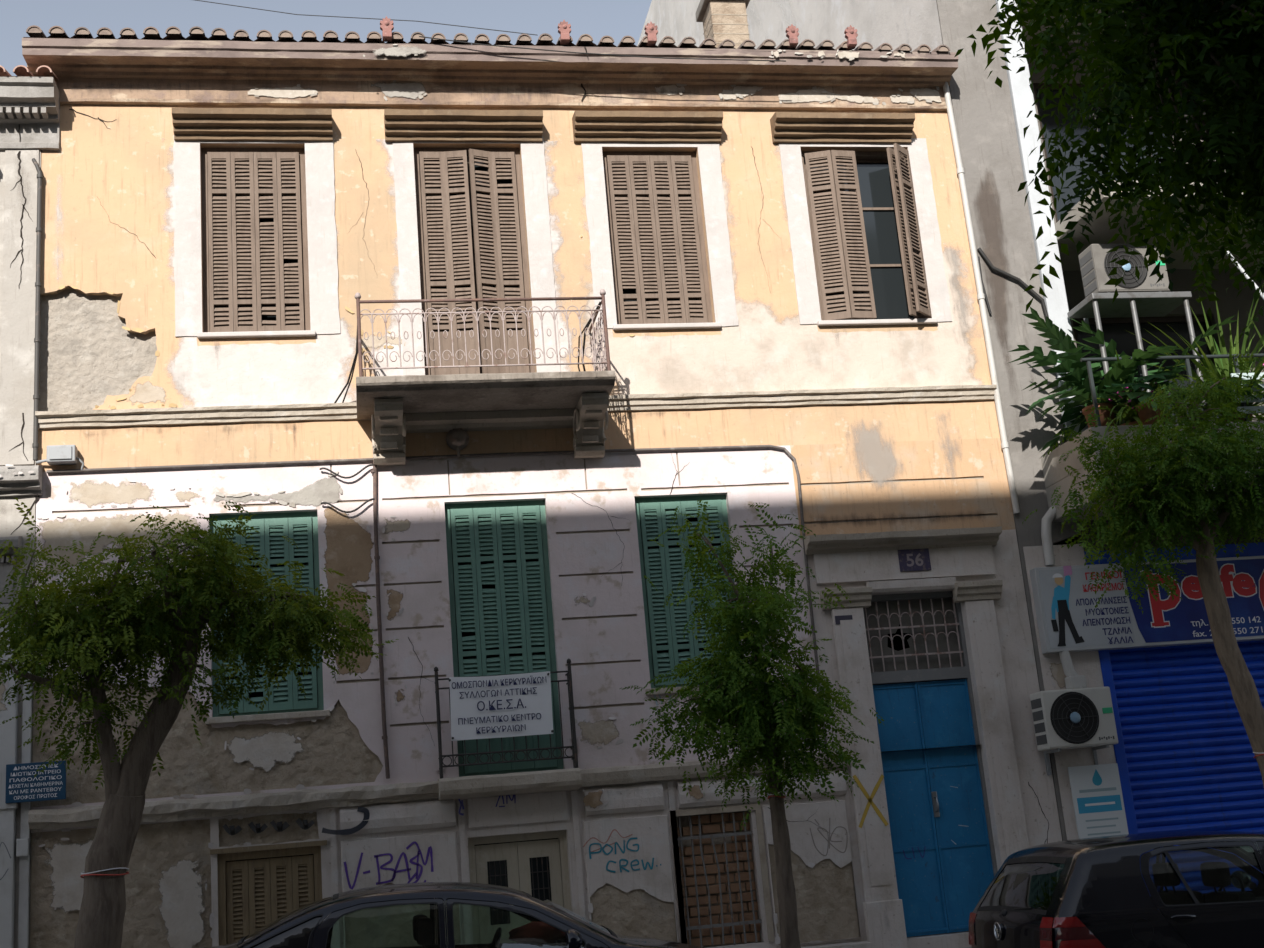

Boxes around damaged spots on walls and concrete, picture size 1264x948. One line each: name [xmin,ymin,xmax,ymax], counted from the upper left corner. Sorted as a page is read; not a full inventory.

crack [10,124,32,285]
peeling [39,267,405,411]
peeling [549,214,982,395]
peeling [322,501,411,679]
spalling [31,677,105,807]
spalling [104,682,160,764]
spalling [145,691,383,799]
spalling [29,828,97,948]
spalling [121,811,319,948]
spalling [588,883,677,942]
spalling [791,851,860,944]